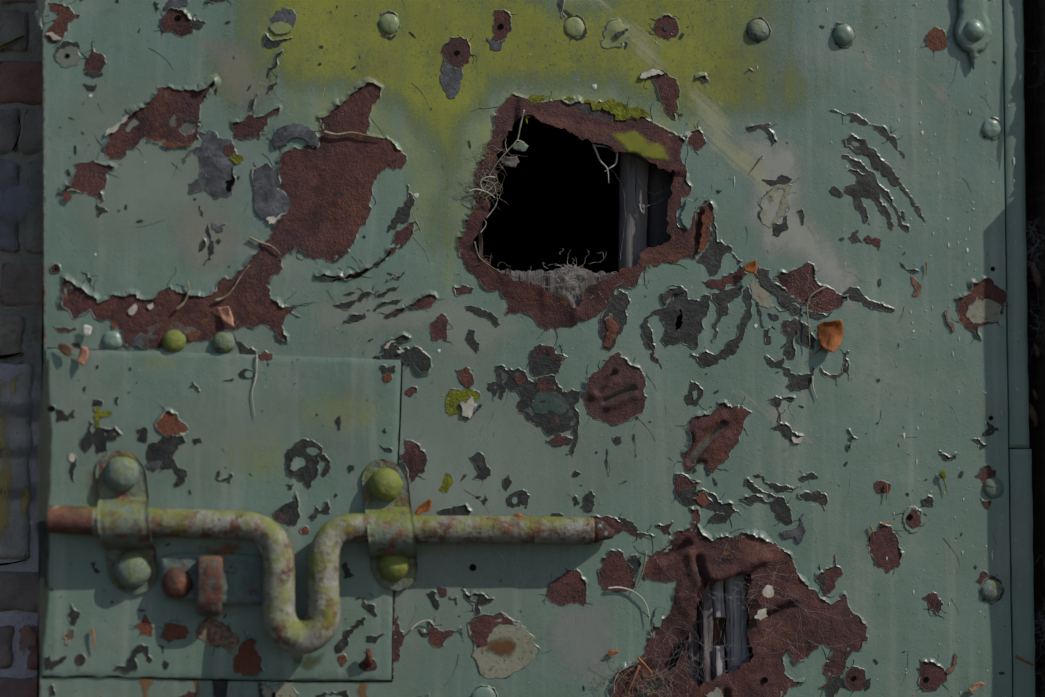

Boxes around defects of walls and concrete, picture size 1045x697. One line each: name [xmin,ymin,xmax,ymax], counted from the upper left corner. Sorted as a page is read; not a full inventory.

peeling [54,73,420,381]
peeling [829,109,926,251]
peeling [900,263,922,297]
peeling [444,215,895,478]
peeling [468,451,531,508]
peeling [671,380,829,544]
peeling [873,480,892,494]
peeling [421,583,541,679]
rust [488,640,516,655]
rust [841,662,871,694]